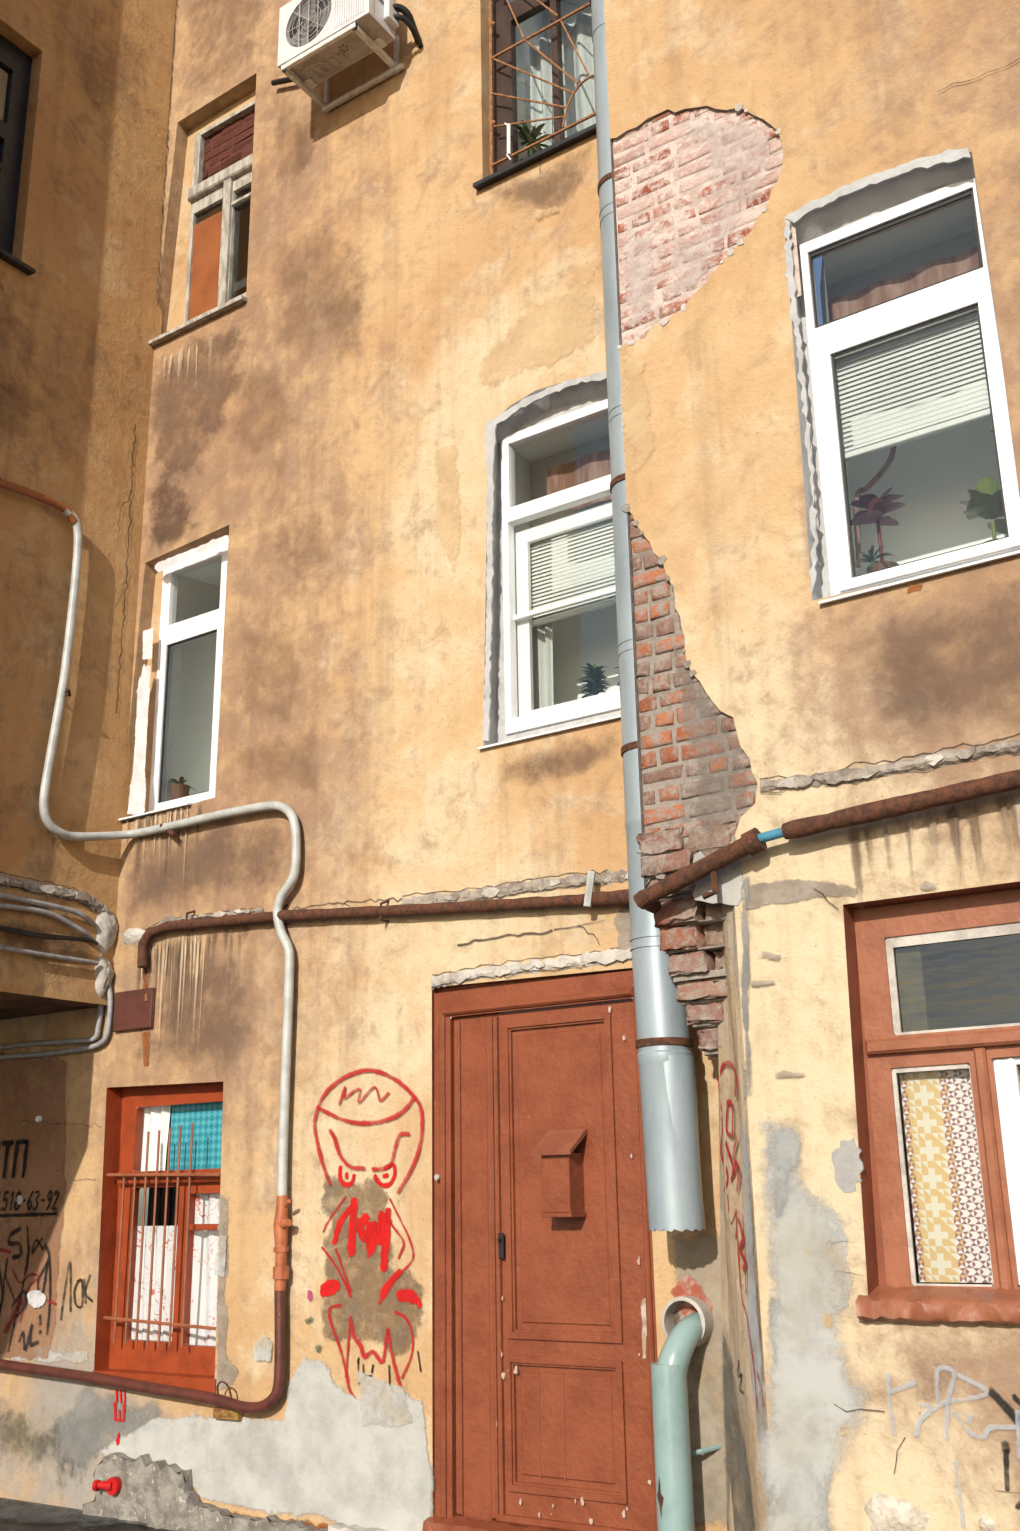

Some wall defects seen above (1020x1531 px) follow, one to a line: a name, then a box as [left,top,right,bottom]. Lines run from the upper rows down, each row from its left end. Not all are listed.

crack [937,58,1020,92]
spalling [613,102,783,350]
spalling [790,225,801,297]
damp [151,330,235,543]
crack [116,424,136,714]
damp [851,832,868,871]
damp [947,811,979,855]
crack [457,920,604,946]
damp [137,931,240,1055]
spalling [402,504,1020,1531]
damp [0,1413,49,1458]
spalling [83,1452,388,1531]